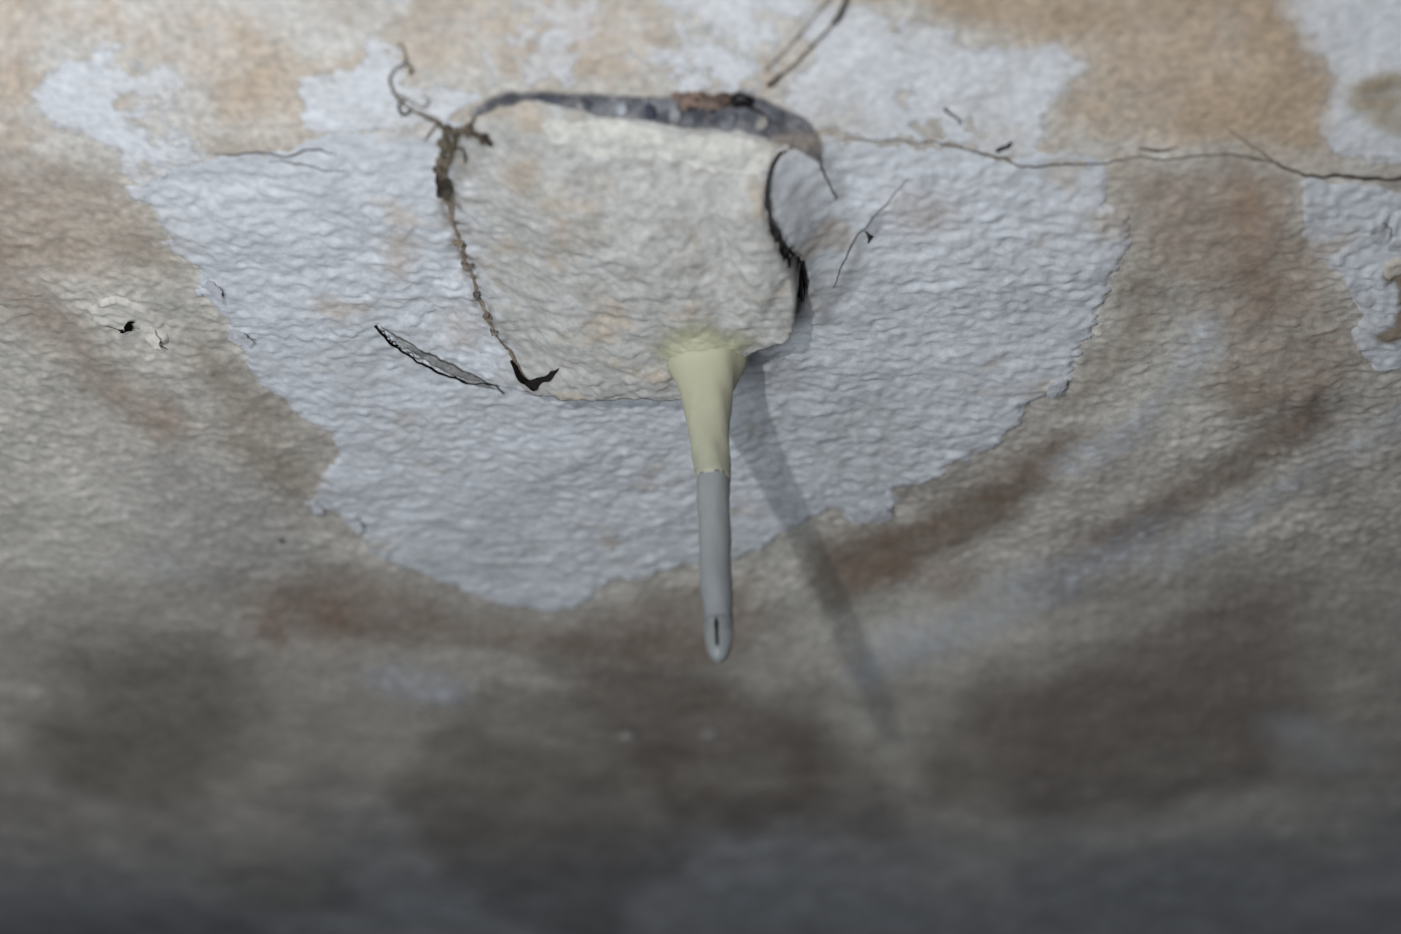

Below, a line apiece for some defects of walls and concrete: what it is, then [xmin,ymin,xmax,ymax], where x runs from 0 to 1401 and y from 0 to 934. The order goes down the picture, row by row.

peeling [1270,0,1401,166]
crack [374,197,558,395]
peeling [25,0,1133,612]
crack [764,125,1401,302]
peeling [1300,177,1401,372]
water stain [830,519,959,590]